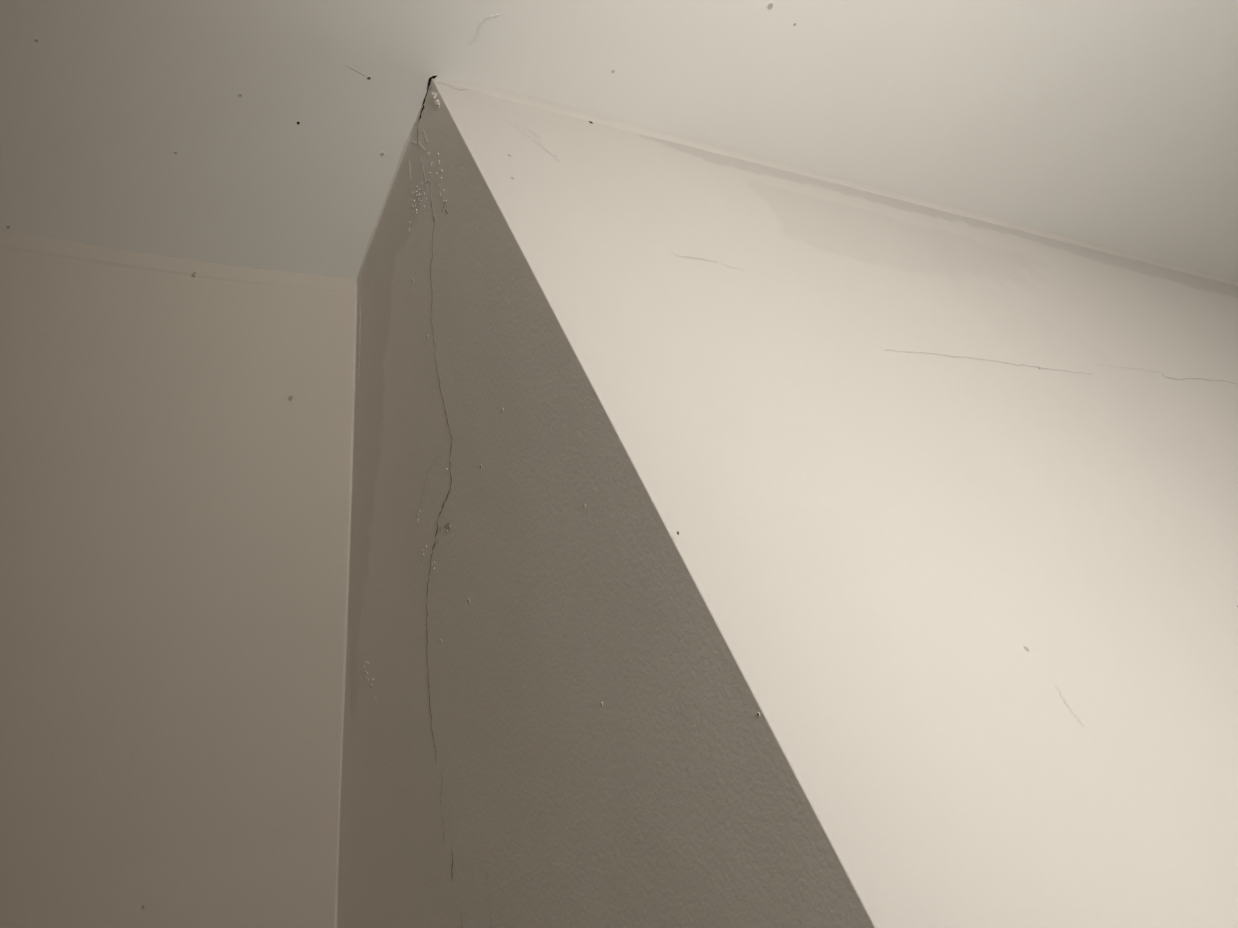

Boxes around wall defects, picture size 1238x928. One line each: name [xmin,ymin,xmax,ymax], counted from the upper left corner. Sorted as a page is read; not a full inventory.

crack [417,75,468,881]
crack [884,349,1238,385]